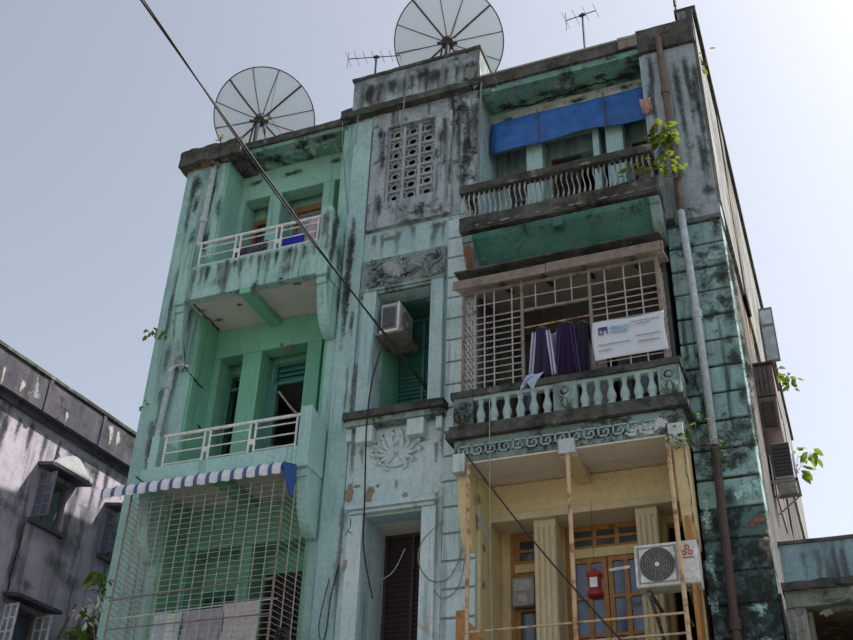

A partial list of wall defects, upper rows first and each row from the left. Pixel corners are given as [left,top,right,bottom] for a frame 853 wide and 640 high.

water stain [365,61,477,105]
water stain [648,58,657,118]
water stain [428,103,479,180]
water stain [673,59,750,273]
water stain [185,176,208,252]
water stain [191,246,315,288]
water stain [322,209,356,329]
crack [194,304,220,331]
water stain [0,407,35,449]
water stain [60,460,109,557]
peeling [345,484,379,503]